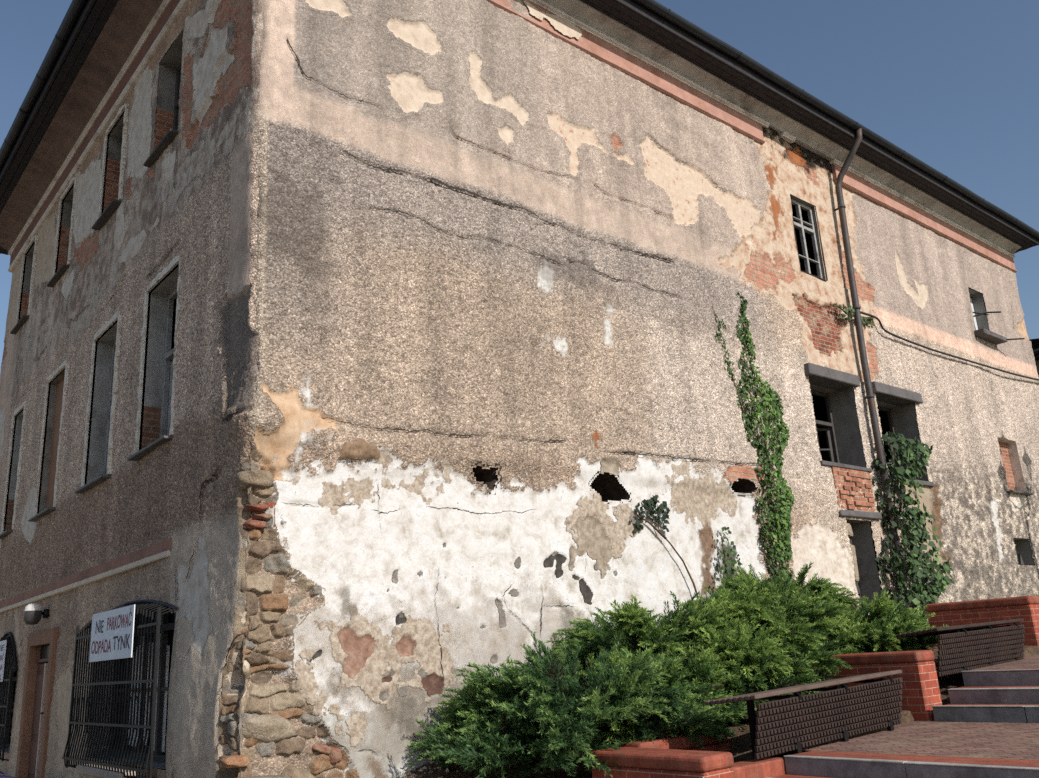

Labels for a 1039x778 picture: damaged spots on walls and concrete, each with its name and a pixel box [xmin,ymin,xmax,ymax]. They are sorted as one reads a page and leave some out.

flaking render [181,0,253,149]
flaking render [305,0,352,18]
flaking render [385,72,443,113]
flaking render [386,17,443,56]
flaking render [468,51,529,145]
crack [451,128,568,176]
peeling [114,172,159,263]
crack [343,150,680,297]
flaking render [547,113,880,383]
crack [286,487,399,533]
crack [429,506,533,514]
flaking render [215,295,772,778]